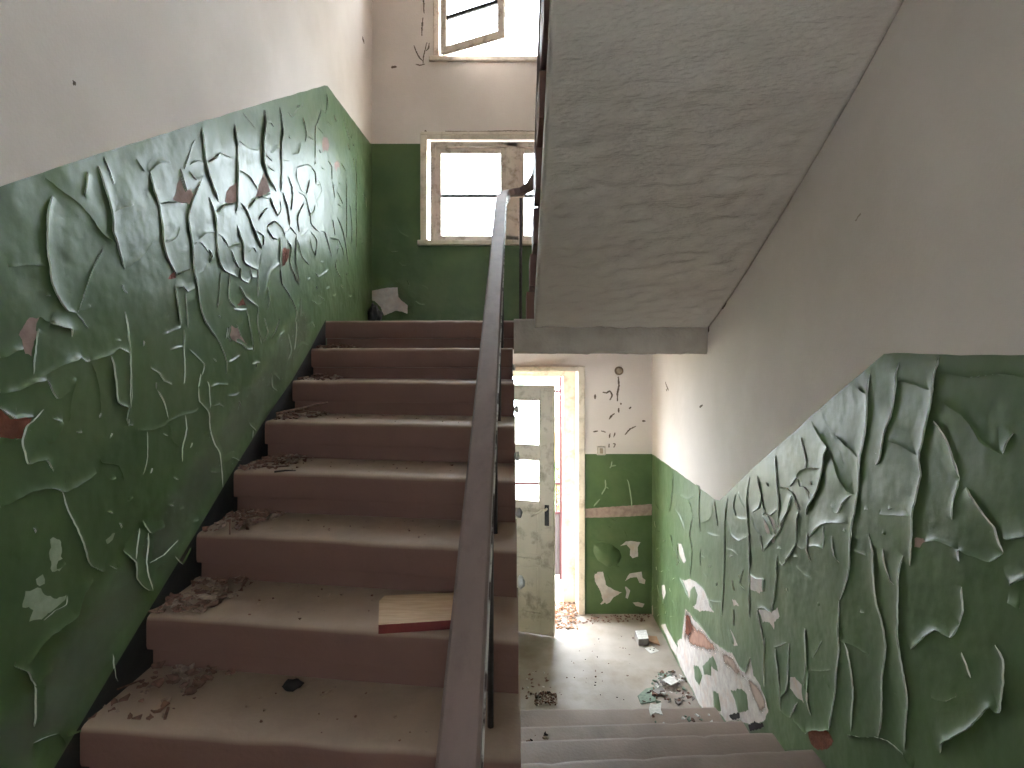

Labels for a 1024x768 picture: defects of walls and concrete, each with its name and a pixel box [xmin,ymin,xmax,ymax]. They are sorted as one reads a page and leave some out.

peeling [173,175,193,204]
peeling [225,183,237,203]
peeling [255,174,271,198]
spalling [282,248,290,267]
peeling [19,317,51,356]
peeling [228,299,247,342]
spalling [0,409,32,452]
peeling [585,541,666,615]
peeling [749,569,779,629]
peeling [661,577,770,731]
peeling [790,672,809,703]
spalling [805,719,833,750]